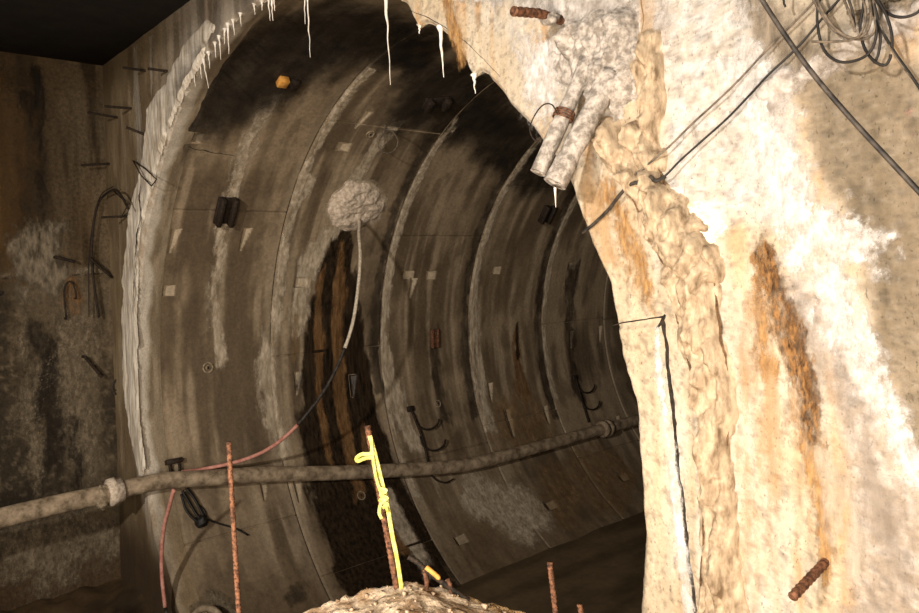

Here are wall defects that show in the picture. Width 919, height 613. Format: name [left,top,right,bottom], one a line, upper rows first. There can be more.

peeling [474,0,636,26]
water stain [188,0,560,466]
water stain [303,477,461,596]
efflorescence [461,470,552,545]
crack [613,314,697,613]
rust [750,242,831,586]